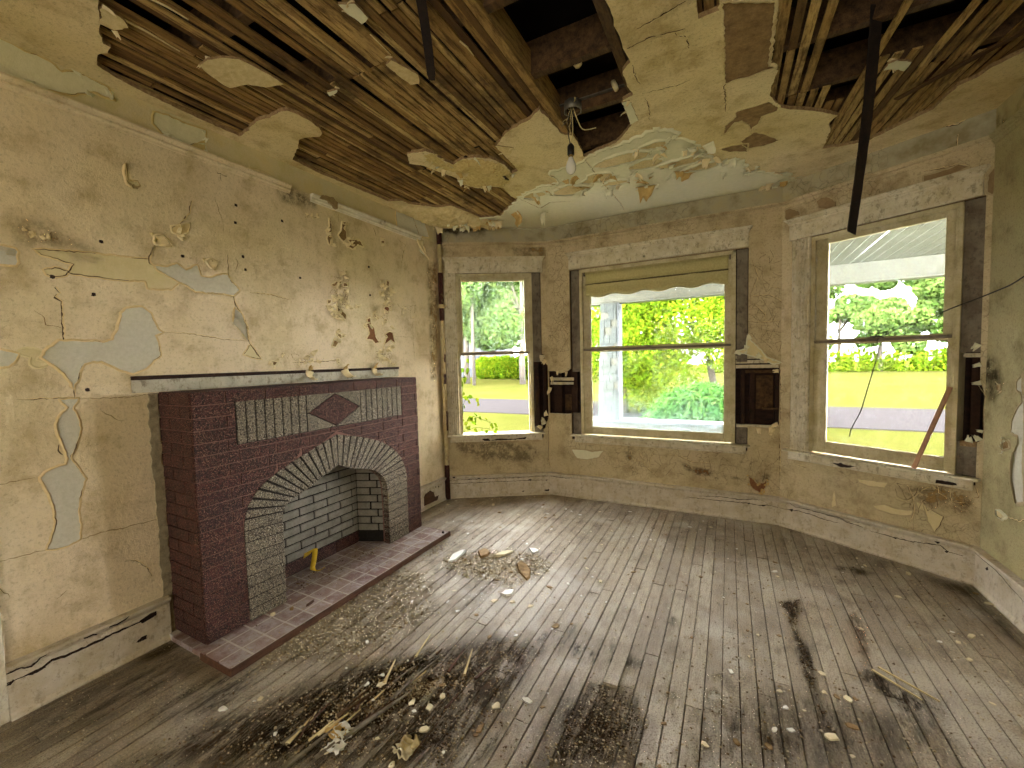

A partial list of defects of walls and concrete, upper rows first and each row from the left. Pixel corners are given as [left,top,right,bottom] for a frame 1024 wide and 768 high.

crack [627,1,691,120]
spalling [718,0,779,84]
peeling [151,110,209,152]
peeling [457,169,516,192]
peeling [479,100,802,229]
peeling [325,217,364,250]
crack [35,287,66,340]
peeling [32,247,396,369]
crack [164,256,288,357]
peeling [38,305,164,551]
peeling [998,372,1024,507]